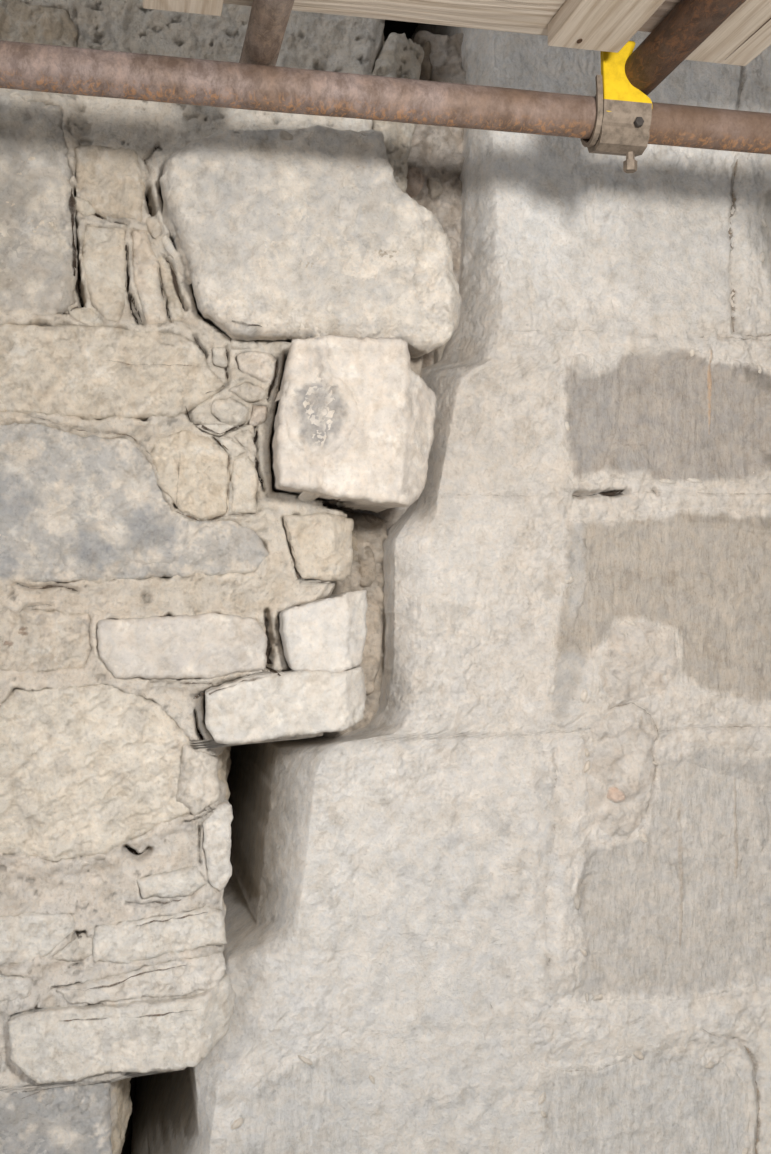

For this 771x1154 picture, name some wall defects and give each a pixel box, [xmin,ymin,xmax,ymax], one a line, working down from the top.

crack [384,30,466,84]
crack [65,190,185,324]
crack [405,124,464,283]
crack [168,338,263,521]
crack [572,489,623,497]
damp [559,353,649,481]
damp [685,509,771,535]
damp [732,360,771,396]
crack [185,615,281,740]
crack [283,499,408,738]
damp [547,520,594,728]
crack [121,1077,136,1154]